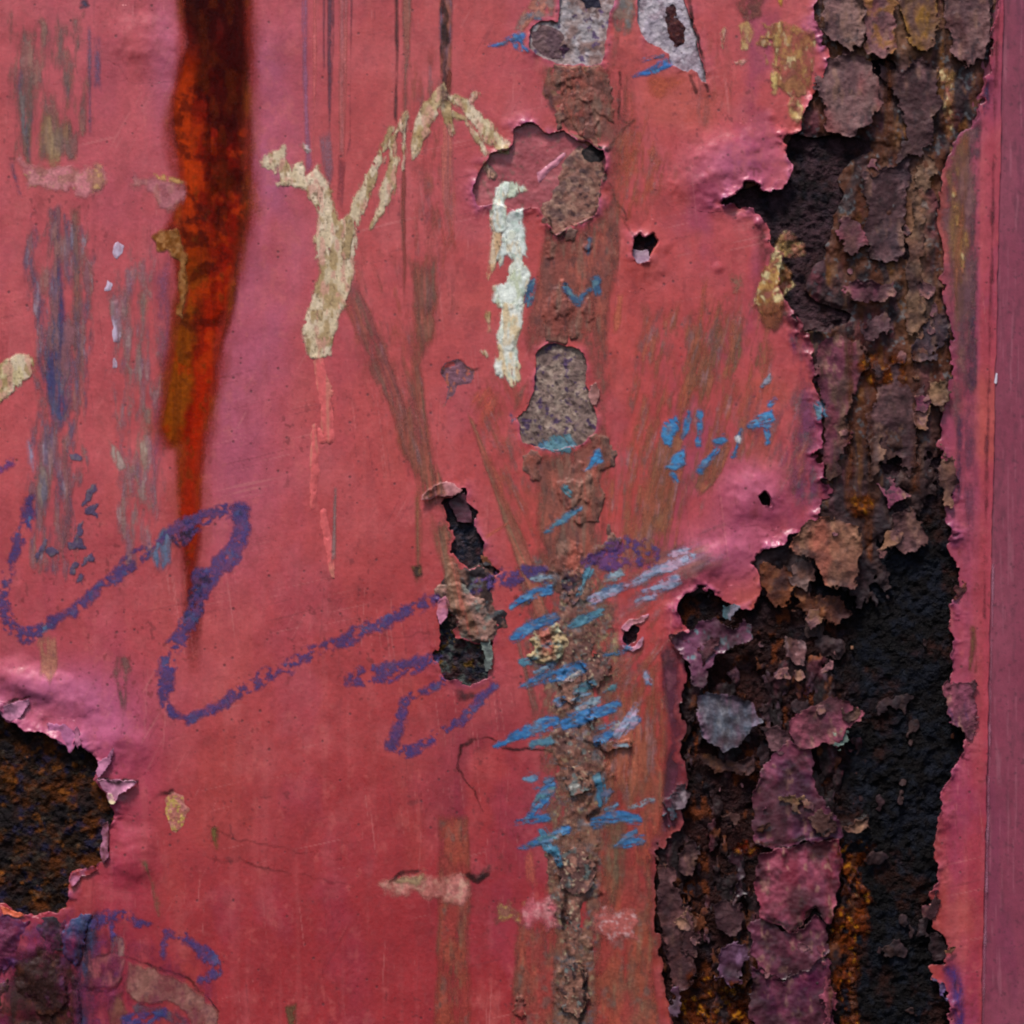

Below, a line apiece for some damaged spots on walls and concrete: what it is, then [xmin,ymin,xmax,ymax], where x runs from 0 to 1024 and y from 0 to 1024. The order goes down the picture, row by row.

peeling [812,0,900,137]
corrosion [152,0,257,643]
peeling [472,0,708,576]
corrosion [783,0,998,609]
peeling [788,516,864,592]
peeling [668,617,753,690]
peeling [96,748,137,804]
crack [459,737,551,795]
corrosion [648,532,847,1024]
corrosion [812,729,866,813]
peeling [754,839,843,934]
corrosion [807,838,889,1024]